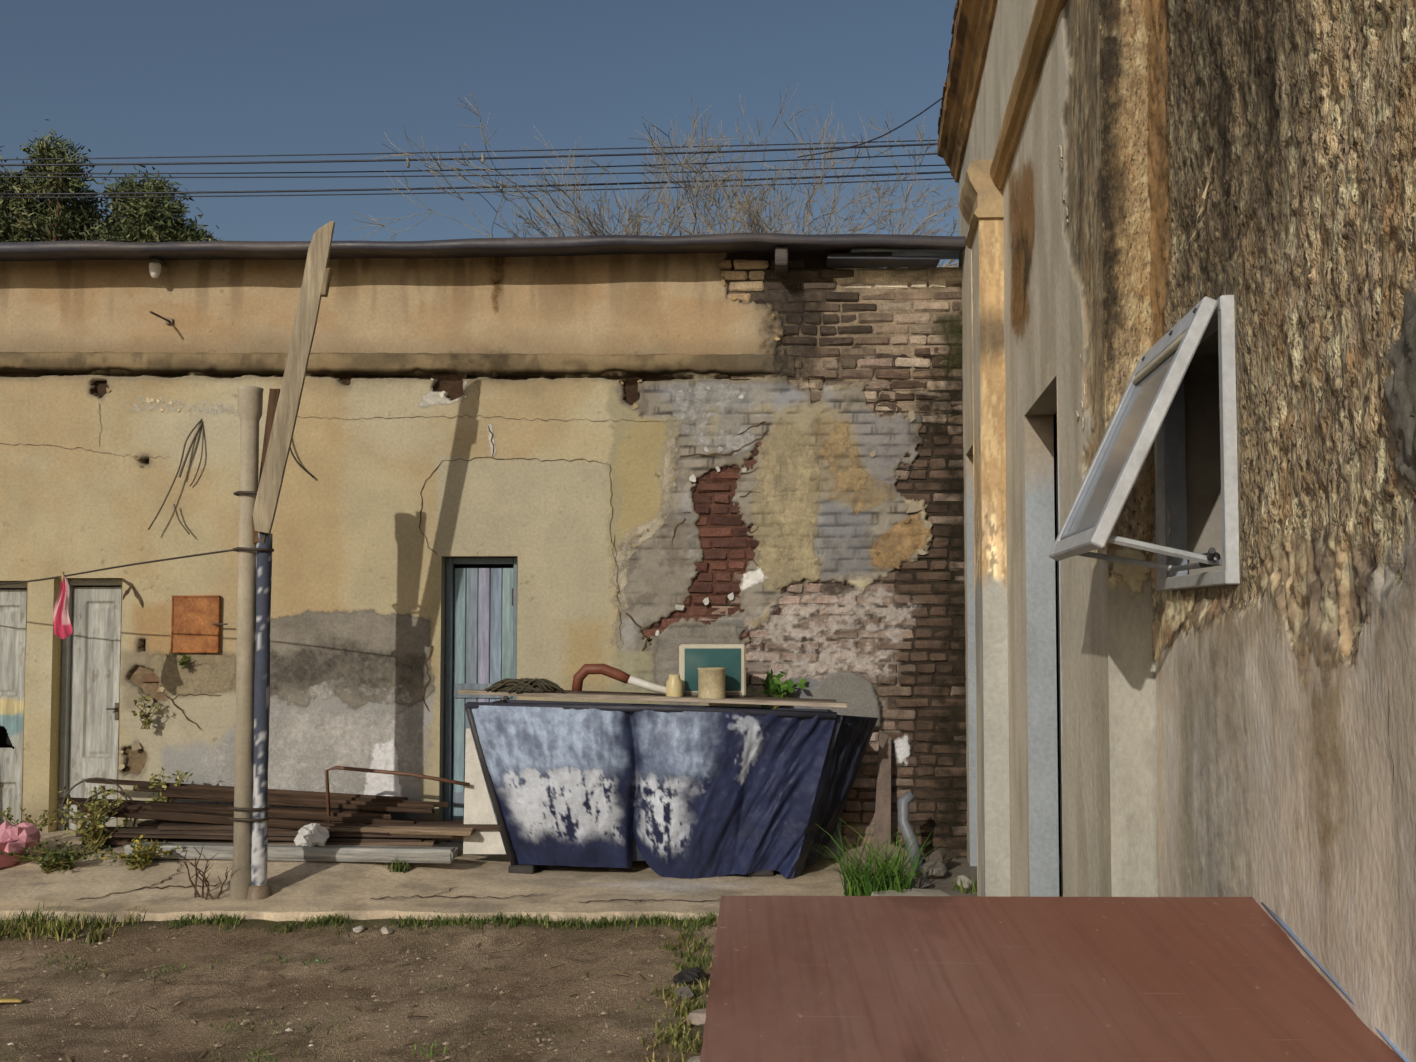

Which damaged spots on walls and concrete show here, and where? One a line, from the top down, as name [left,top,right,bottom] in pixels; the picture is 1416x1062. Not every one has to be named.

water stain [1094,0,1124,324]
water stain [1009,159,1034,335]
spalling [419,373,468,408]
spalling [129,639,167,705]
spalling [610,259,967,858]
peeling [1111,511,1233,663]
peeling [1255,527,1416,686]